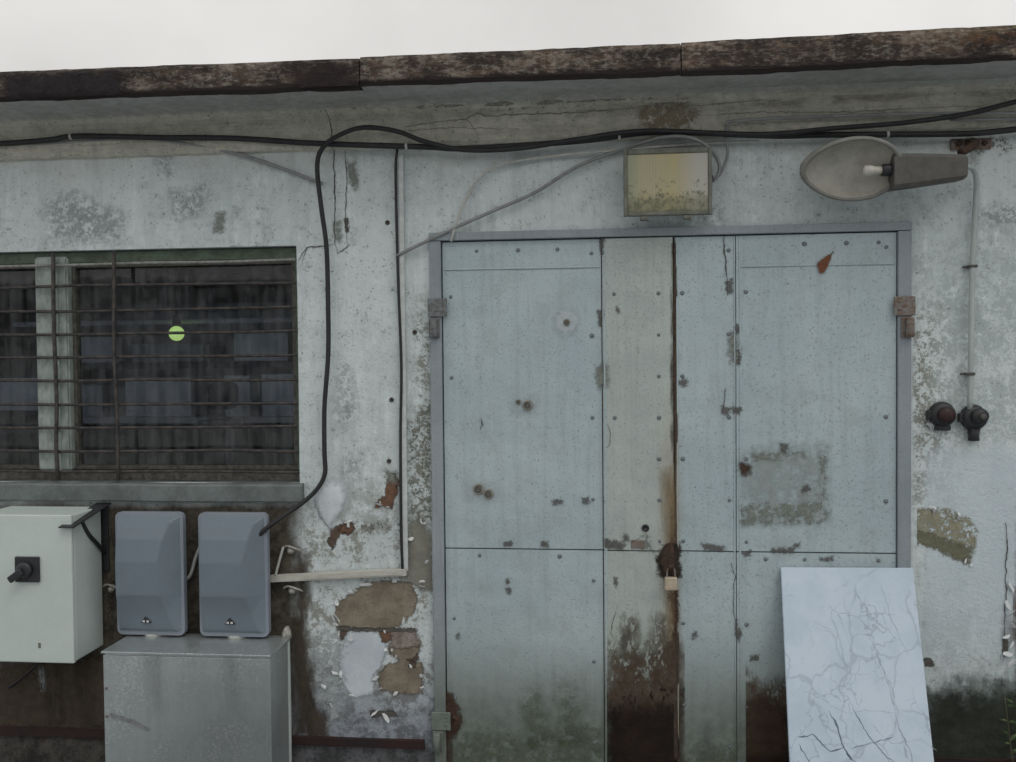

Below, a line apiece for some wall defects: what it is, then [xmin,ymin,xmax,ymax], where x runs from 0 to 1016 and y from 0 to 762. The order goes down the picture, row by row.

leakage [4,69,121,99]
leakage [639,102,697,129]
rust [817,251,834,273]
flaking render [310,403,432,728]
rust [607,243,684,762]
peeling [917,505,978,566]
leakage [0,653,148,731]
rust [746,670,789,762]